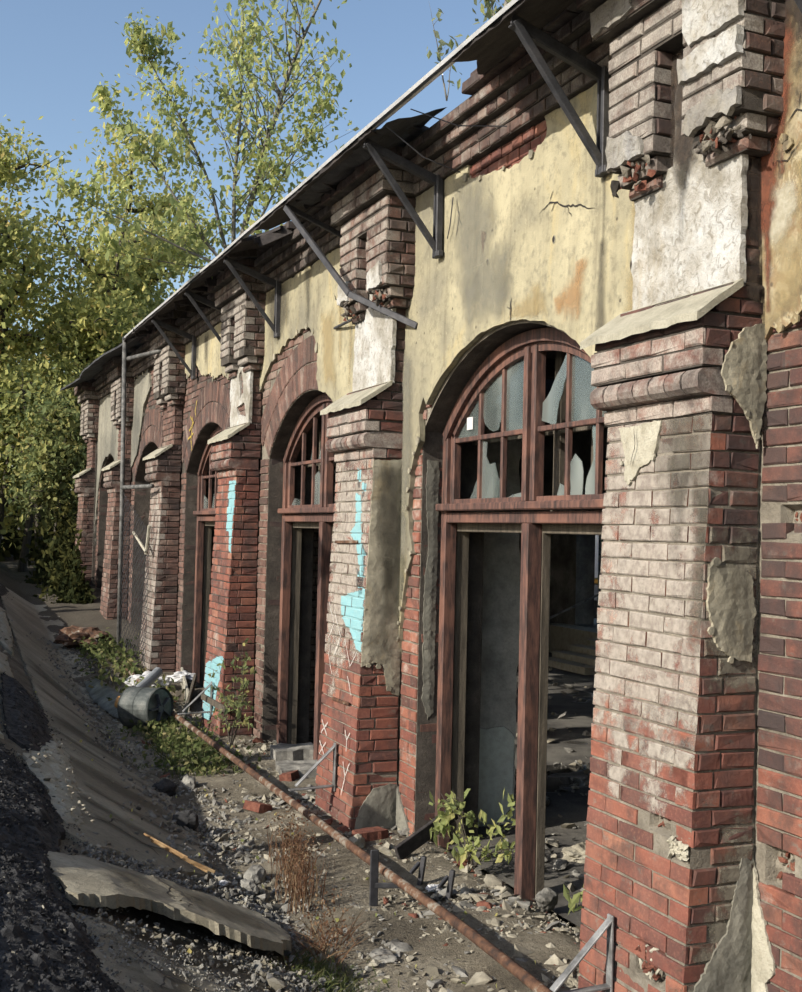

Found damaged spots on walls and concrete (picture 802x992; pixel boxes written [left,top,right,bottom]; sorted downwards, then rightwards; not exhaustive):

spalling [462,120,547,182]
crack [539,192,590,217]
spalling [776,313,800,333]
peeling [421,460,440,720]
spalling [658,815,691,861]
spalling [776,851,795,878]